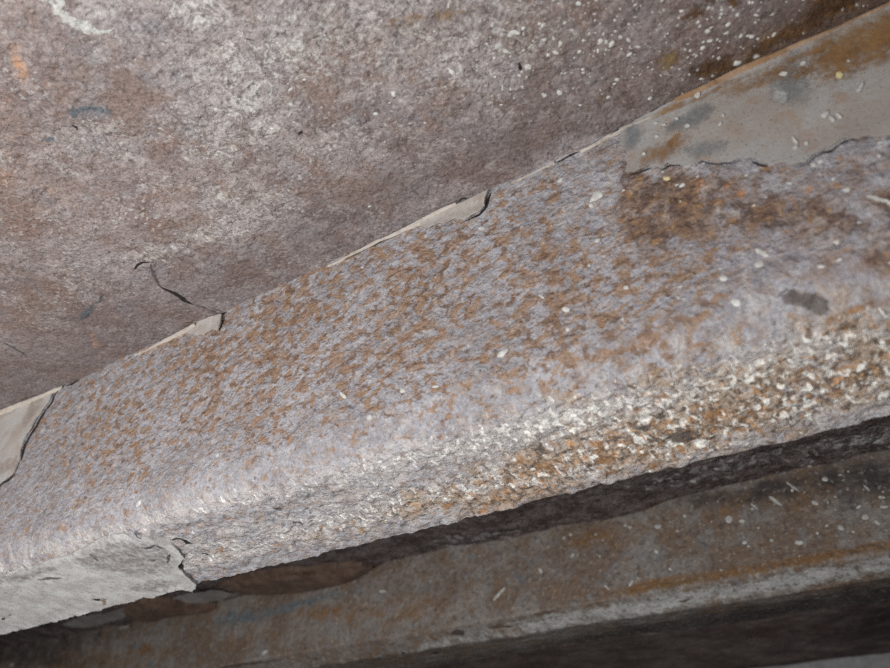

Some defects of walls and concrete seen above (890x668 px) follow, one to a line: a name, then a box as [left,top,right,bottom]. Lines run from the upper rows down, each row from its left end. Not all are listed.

peeling [675,2,890,102]
peeling [511,112,661,184]
peeling [328,190,491,267]
crack [135,262,218,314]
rust [777,289,828,315]
peeling [0,380,79,486]
spalling [667,430,703,442]
peeling [63,608,129,629]
peeling [173,590,232,603]
rust [220,561,374,595]